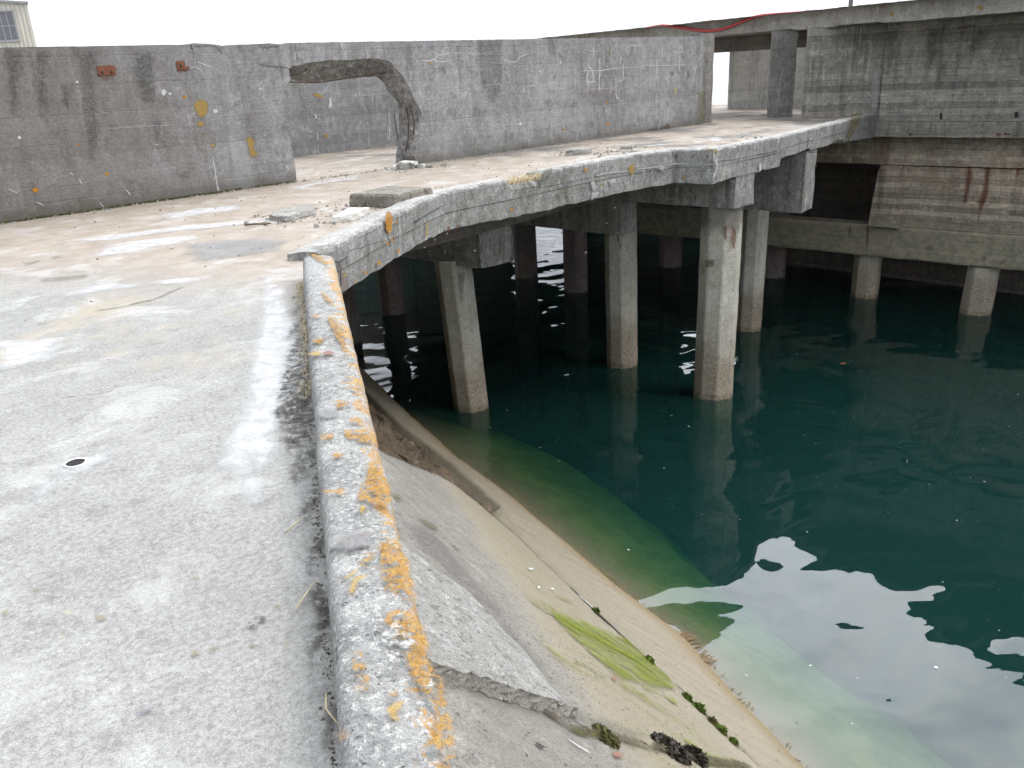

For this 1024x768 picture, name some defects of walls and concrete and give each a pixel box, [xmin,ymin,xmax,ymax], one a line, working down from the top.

rust [979,167,990,211]